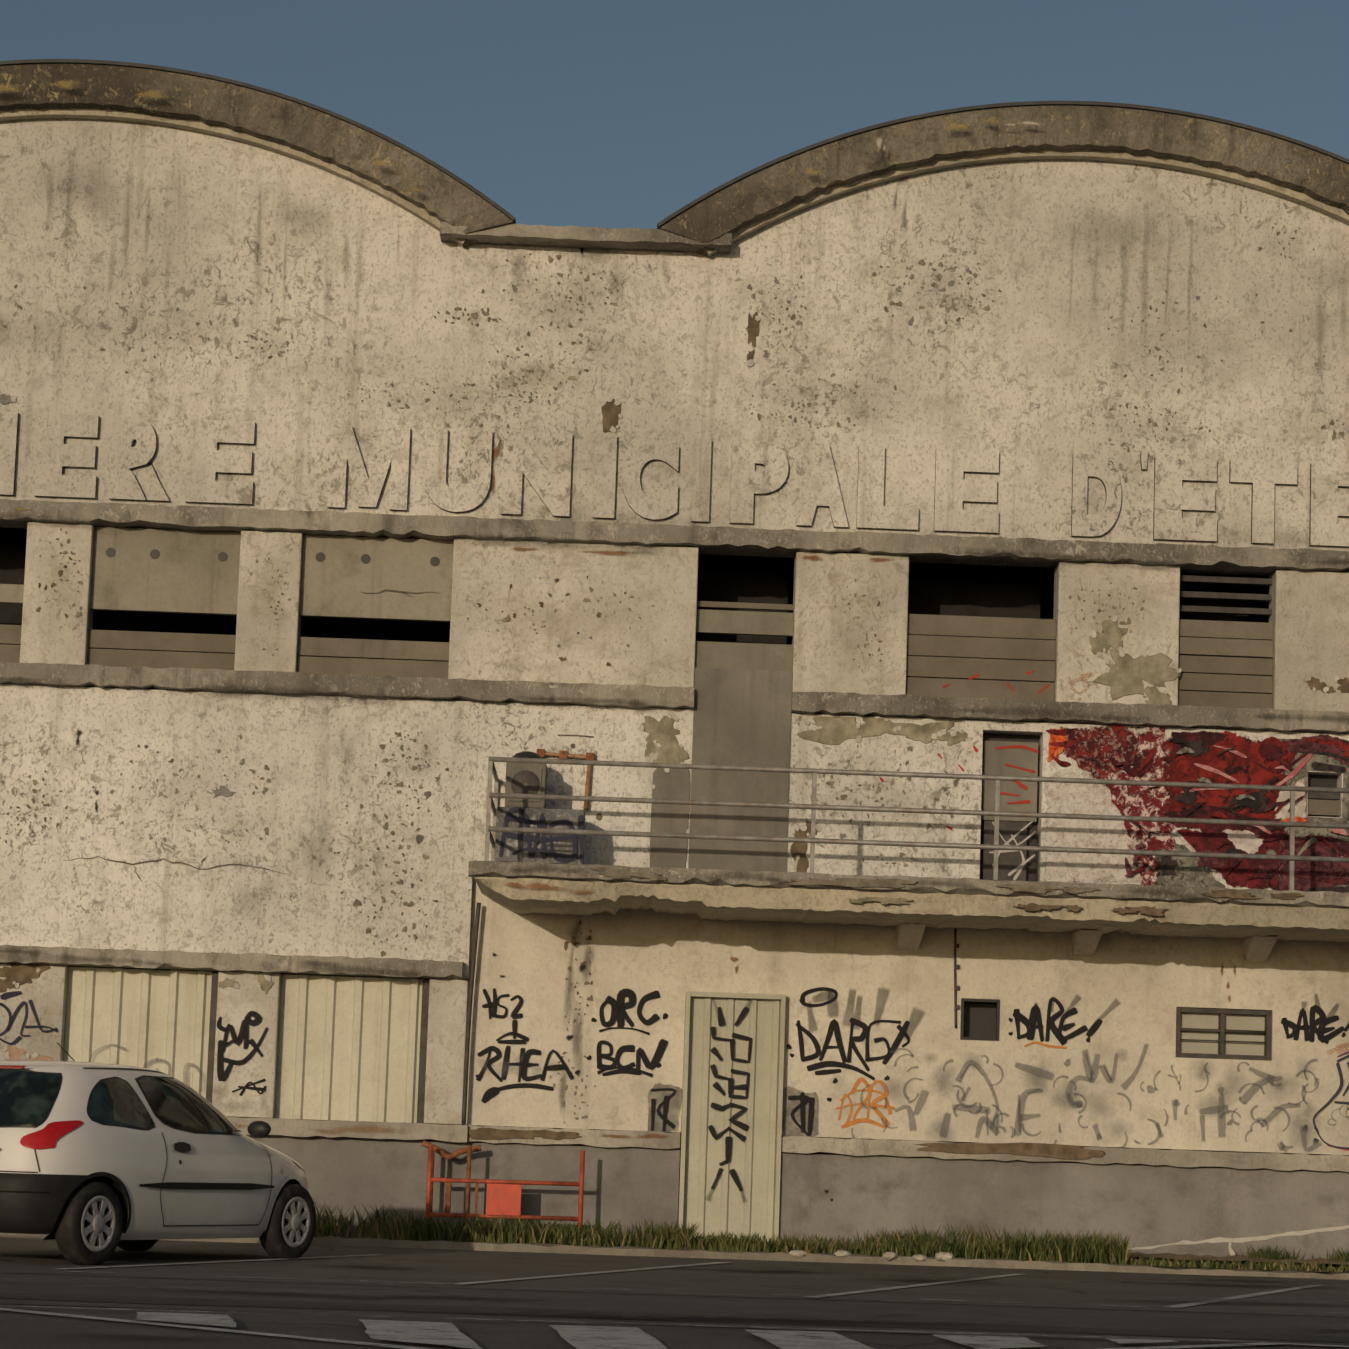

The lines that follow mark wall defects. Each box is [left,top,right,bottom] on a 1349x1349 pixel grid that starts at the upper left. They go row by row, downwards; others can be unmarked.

peeling [424,253,622,433]
spalling [744,257,807,367]
peeling [1068,578,1182,705]
peeling [1305,675,1349,693]
peeling [5,770,67,843]
crack [69,856,289,880]
peeling [638,713,691,868]
peeling [786,716,968,905]